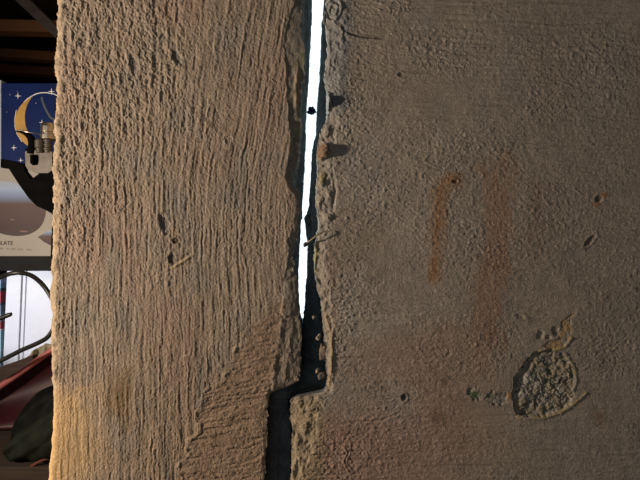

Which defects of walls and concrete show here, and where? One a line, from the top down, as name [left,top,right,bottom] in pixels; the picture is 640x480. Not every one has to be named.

crack [264,0,385,480]
spalling [463,310,589,422]